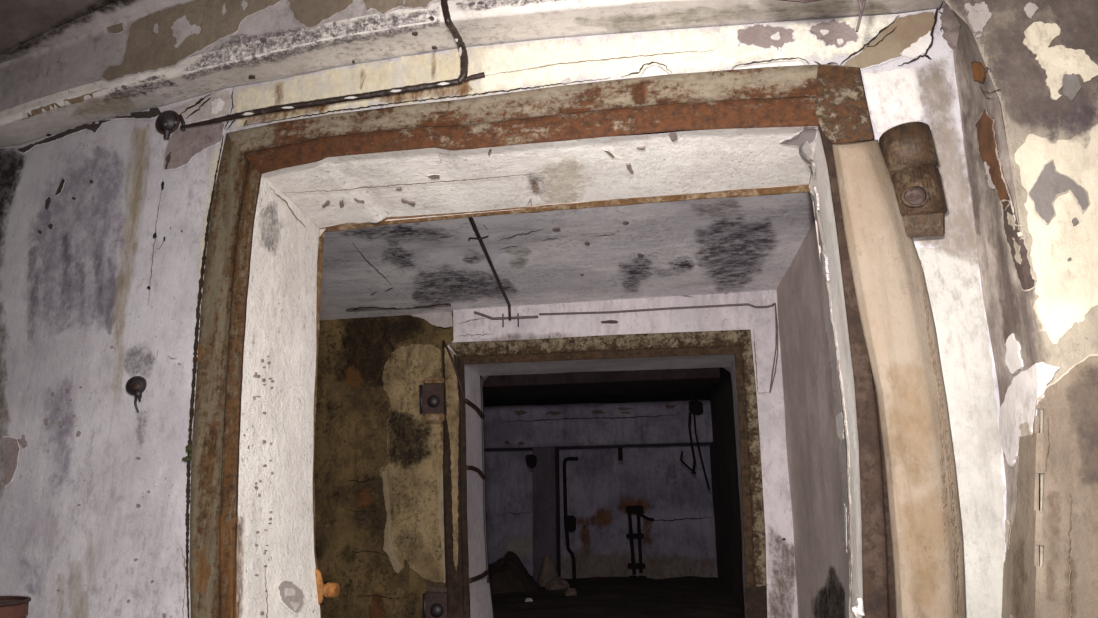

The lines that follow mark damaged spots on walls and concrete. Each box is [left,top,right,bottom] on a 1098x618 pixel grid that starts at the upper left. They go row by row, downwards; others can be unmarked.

peeling [100,0,439,103]
crack [814,15,899,65]
crack [898,1,943,66]
rust [632,84,647,104]
leakage [0,148,23,240]
spalling [975,108,1037,291]
peeling [1027,159,1090,226]
leakage [670,204,775,290]
leakage [337,316,422,386]
spalling [1001,354,1098,618]
rust [577,497,651,561]
leakage [813,568,845,618]